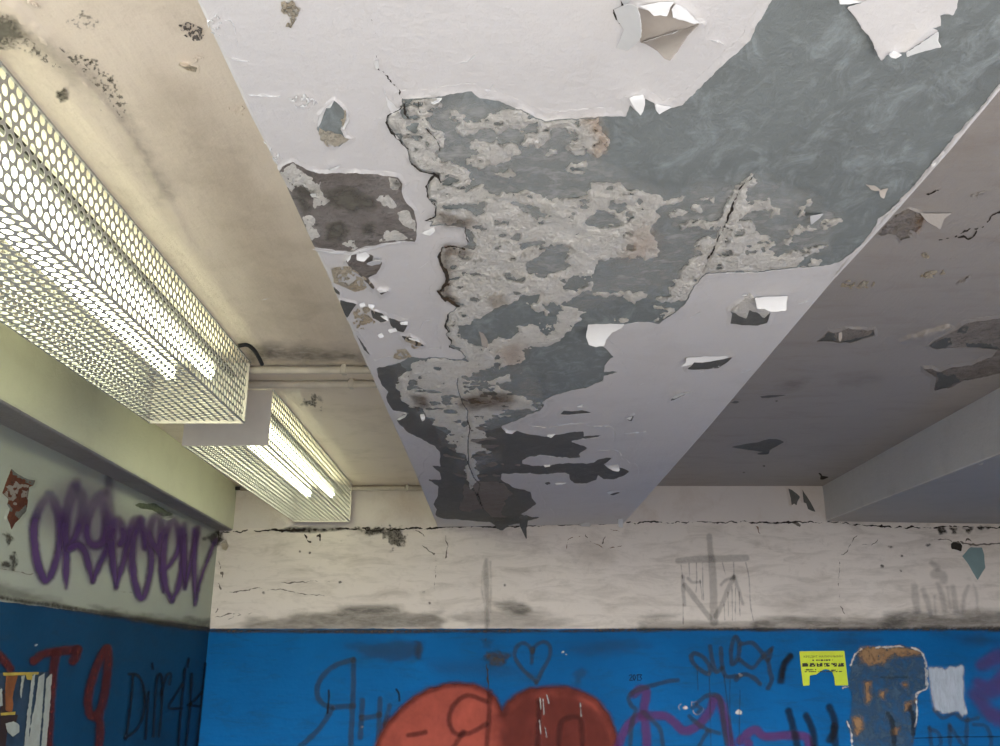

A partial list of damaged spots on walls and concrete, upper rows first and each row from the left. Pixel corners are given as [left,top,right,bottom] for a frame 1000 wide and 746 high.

leakage [0,16,22,48]
crack [376,56,441,221]
crack [707,178,752,260]
crack [939,211,1000,240]
peeling [263,0,1000,539]
crack [223,227,1000,614]
spalling [0,465,38,533]
leakage [203,532,223,546]
leakage [282,525,405,546]